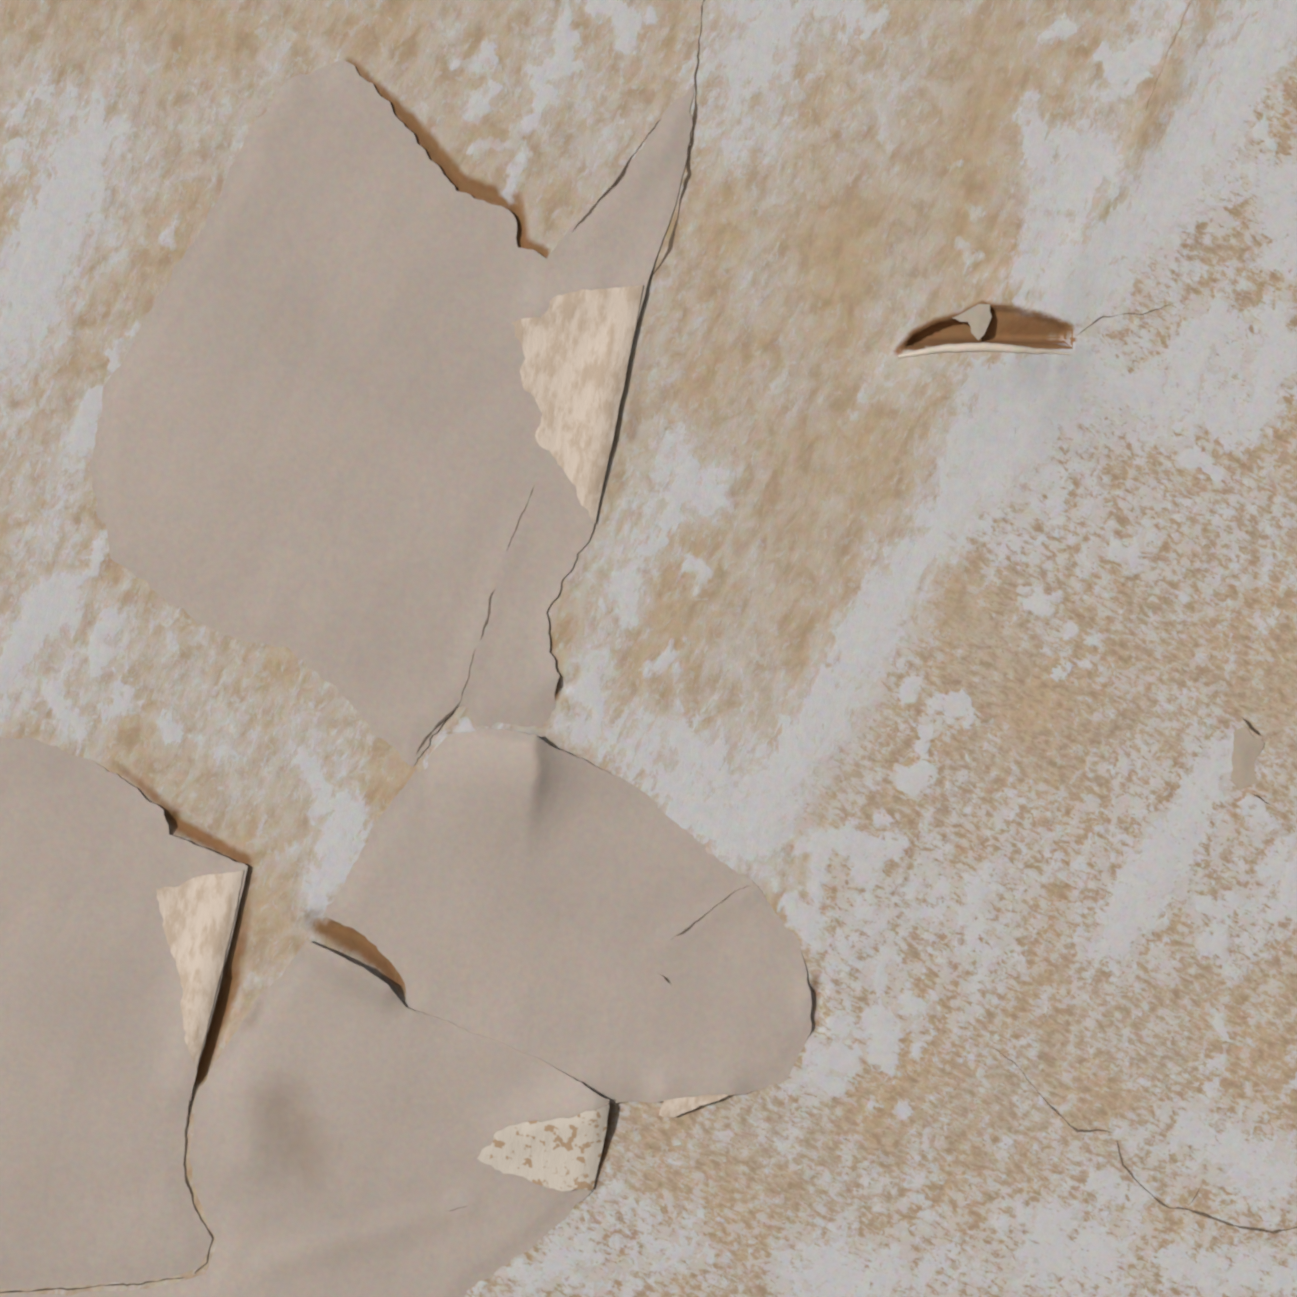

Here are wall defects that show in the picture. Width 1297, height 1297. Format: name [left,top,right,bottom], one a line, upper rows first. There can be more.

crack [574,120,660,230]
crack [652,0,704,276]
peeling [727,0,1297,891]
peeling [0,0,928,1297]
crack [996,1049,1297,1234]